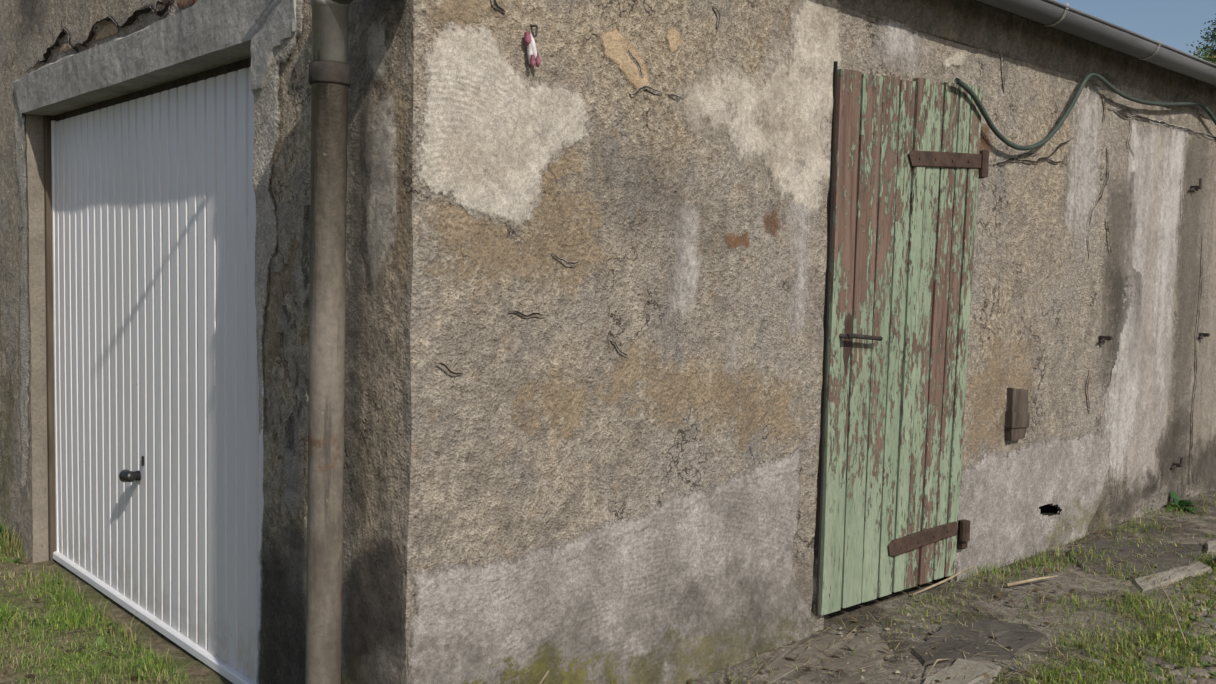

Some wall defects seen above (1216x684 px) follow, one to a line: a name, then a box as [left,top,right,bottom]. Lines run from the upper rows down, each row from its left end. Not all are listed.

spalling [34,0,198,70]
peeling [600,29,650,93]
peeling [666,29,683,52]
damp [1066,73,1112,240]
damp [1088,124,1216,535]
damp [258,521,307,684]
damp [341,538,405,684]